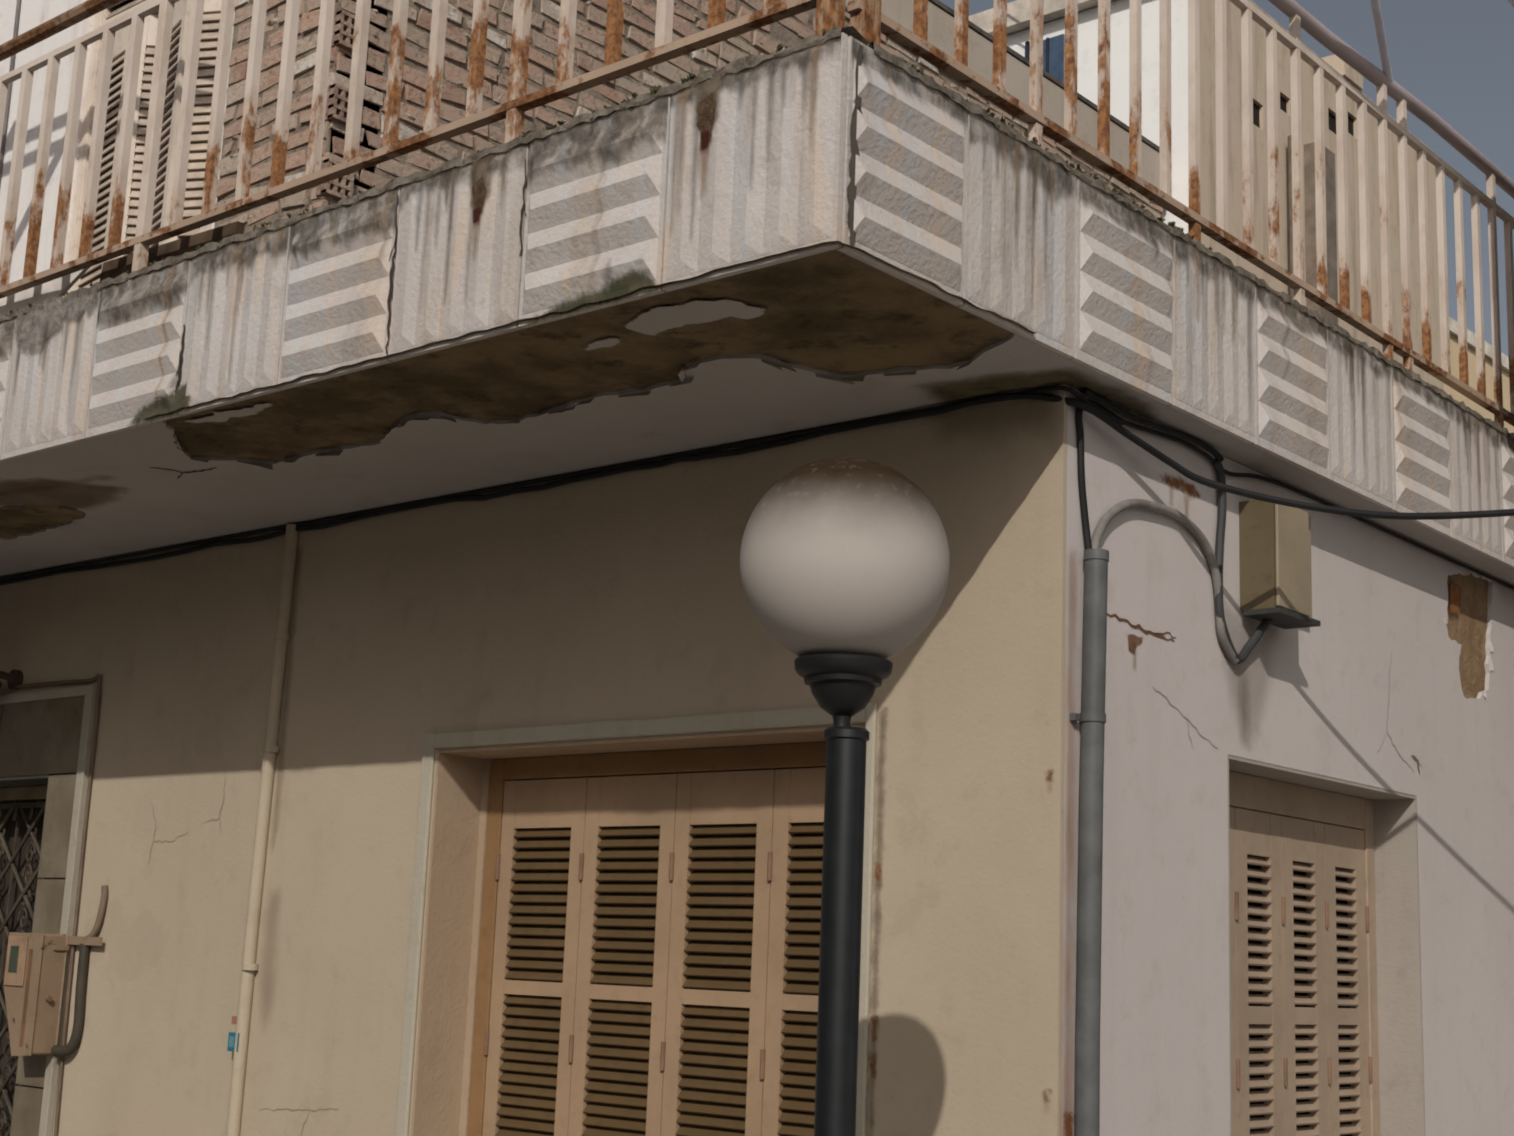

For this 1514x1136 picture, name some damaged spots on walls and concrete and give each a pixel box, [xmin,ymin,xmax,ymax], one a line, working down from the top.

leakage [73,82,696,324]
leakage [720,36,1514,450]
flaking render [145,241,1036,470]
leakage [132,384,190,425]
flaking render [0,505,85,538]
leakage [0,480,115,508]
crack [1107,613,1176,642]
flaking render [1444,573,1498,699]
crack [1153,686,1218,748]
crack [261,1108,338,1135]